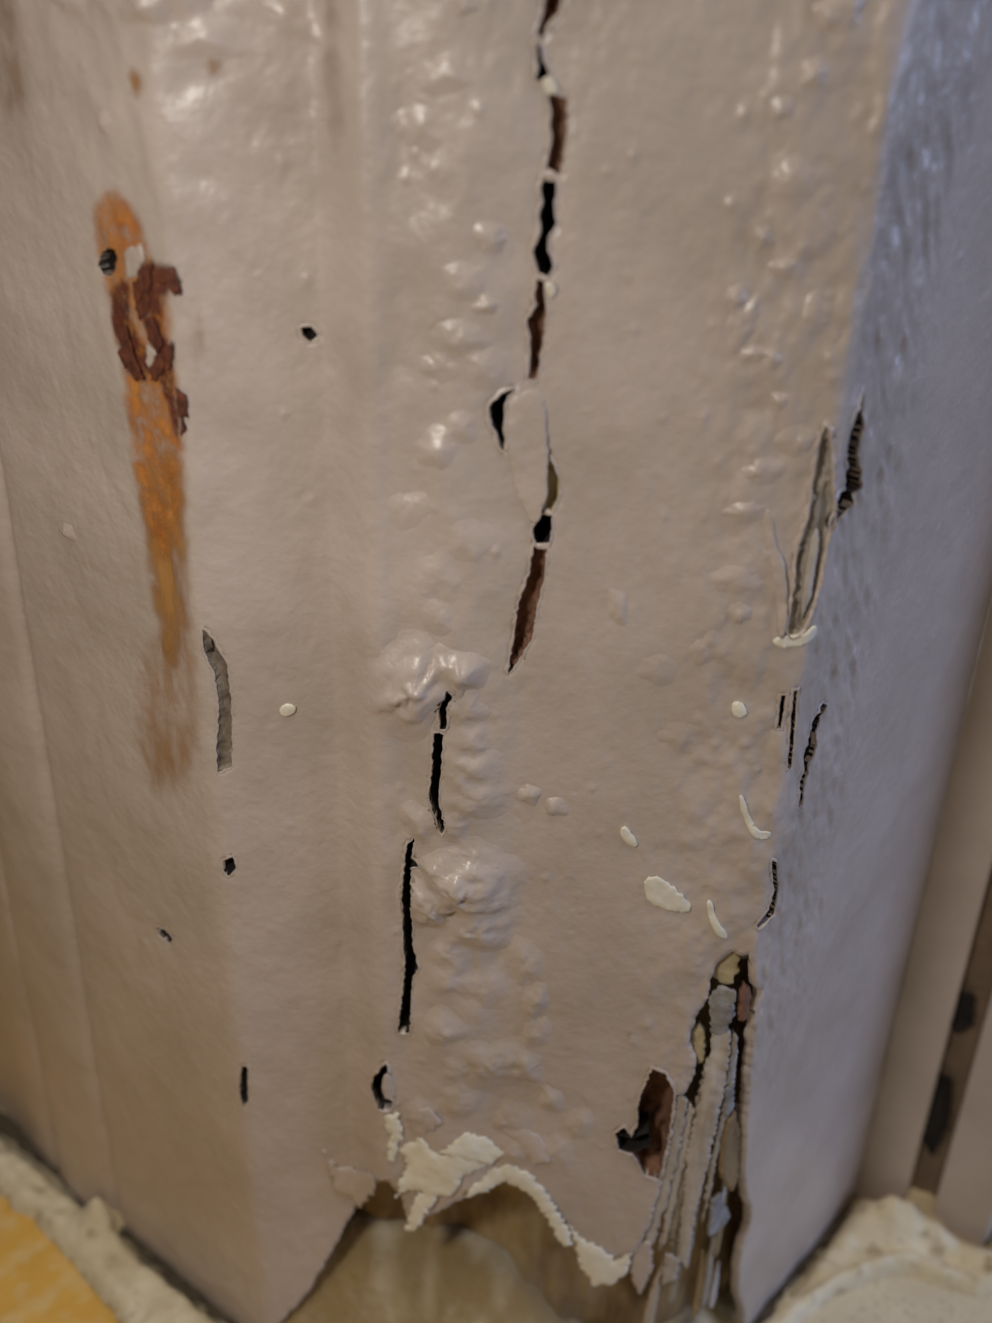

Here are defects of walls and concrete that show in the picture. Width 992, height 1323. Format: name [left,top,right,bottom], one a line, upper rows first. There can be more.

rust [96,197,189,660]
crack [486,0,573,676]
crack [825,386,867,538]
crack [774,687,829,811]
crack [395,691,456,1036]
crack [707,795,779,939]
peeling [322,1149,377,1208]
peeling [382,1073,654,1294]